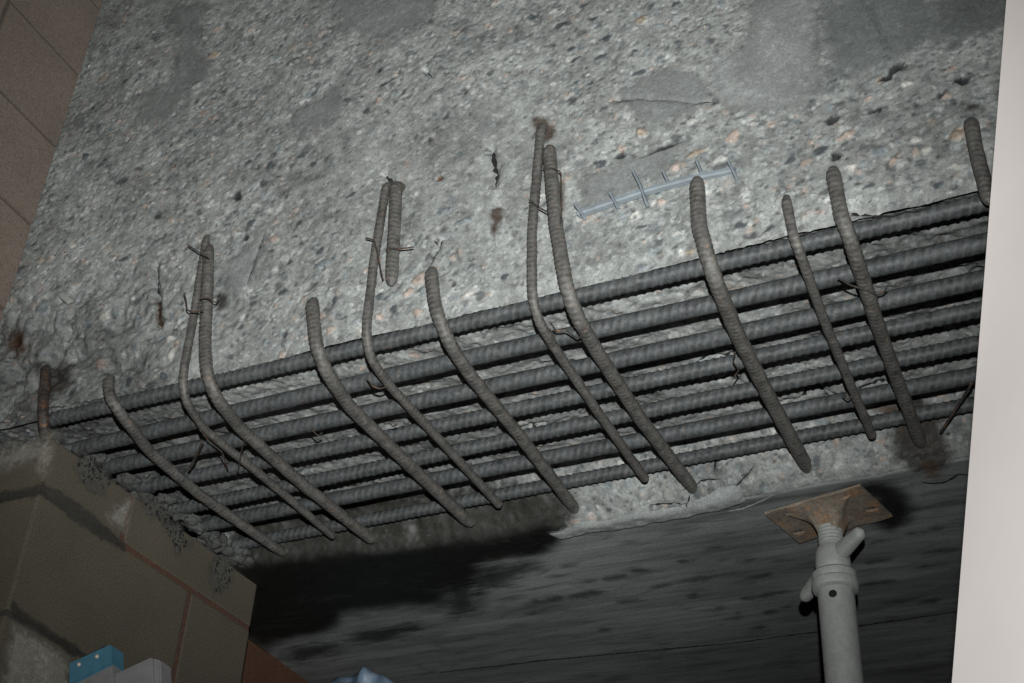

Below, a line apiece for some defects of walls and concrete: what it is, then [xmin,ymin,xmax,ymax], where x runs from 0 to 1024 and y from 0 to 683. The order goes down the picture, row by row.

rust [533,118,554,140]
rust [492,208,502,232]
spalling [0,0,1006,492]
spalling [144,396,642,553]
spalling [441,423,914,529]
rust [894,418,946,470]
spalling [213,526,240,592]